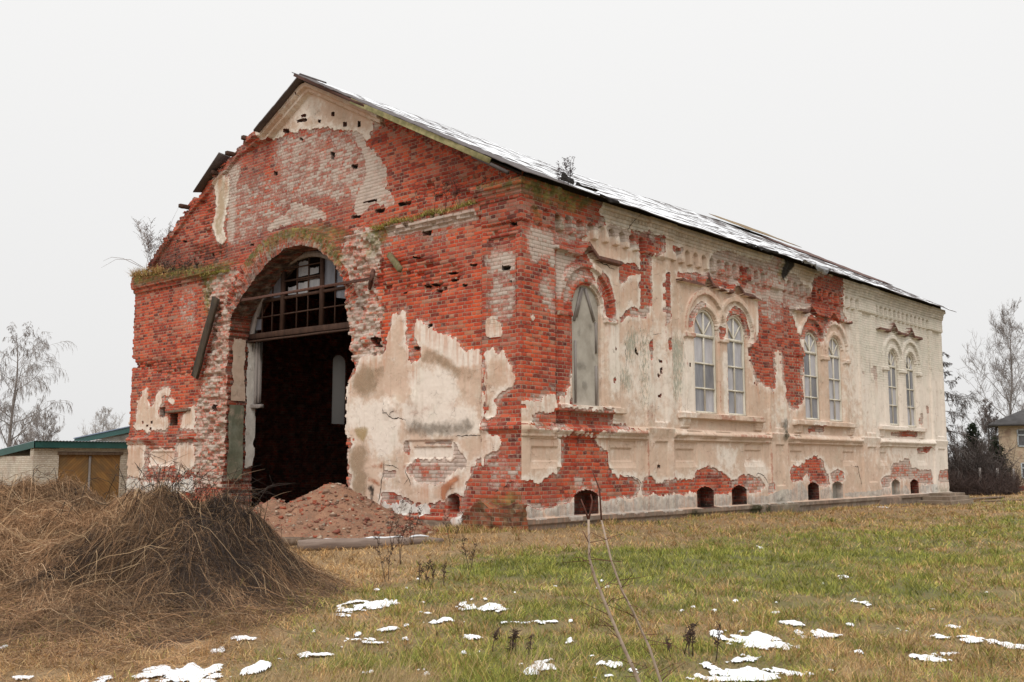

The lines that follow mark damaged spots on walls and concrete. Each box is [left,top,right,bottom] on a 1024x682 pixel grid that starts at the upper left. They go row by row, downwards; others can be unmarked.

spalling [126,175,255,494]
leakage [410,424,471,433]
flaking render [264,83,949,521]